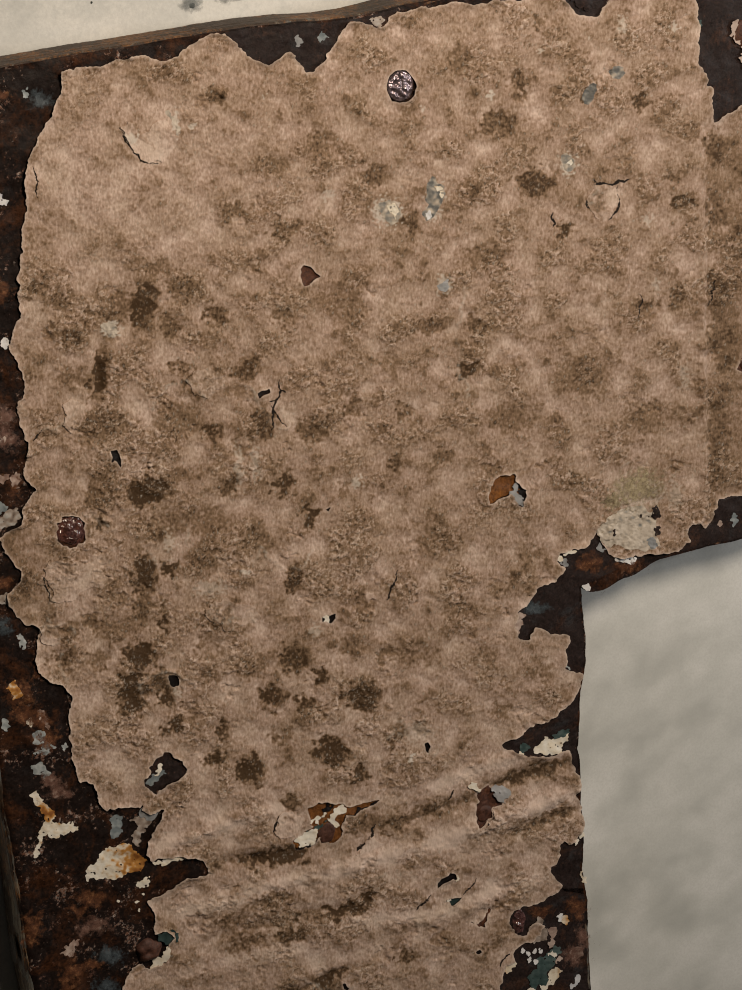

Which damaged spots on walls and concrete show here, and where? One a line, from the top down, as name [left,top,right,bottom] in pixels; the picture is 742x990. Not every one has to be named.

peeling [696,0,742,123]
crack [585,179,629,220]
rust [0,407,22,452]
peeling [0,59,209,990]
peeling [681,496,742,551]
peeling [515,505,661,673]
rust [5,671,61,754]
peeling [502,692,579,774]
rust [42,772,72,800]
rust [65,891,107,938]
peeling [500,832,589,990]
rust [60,959,105,990]